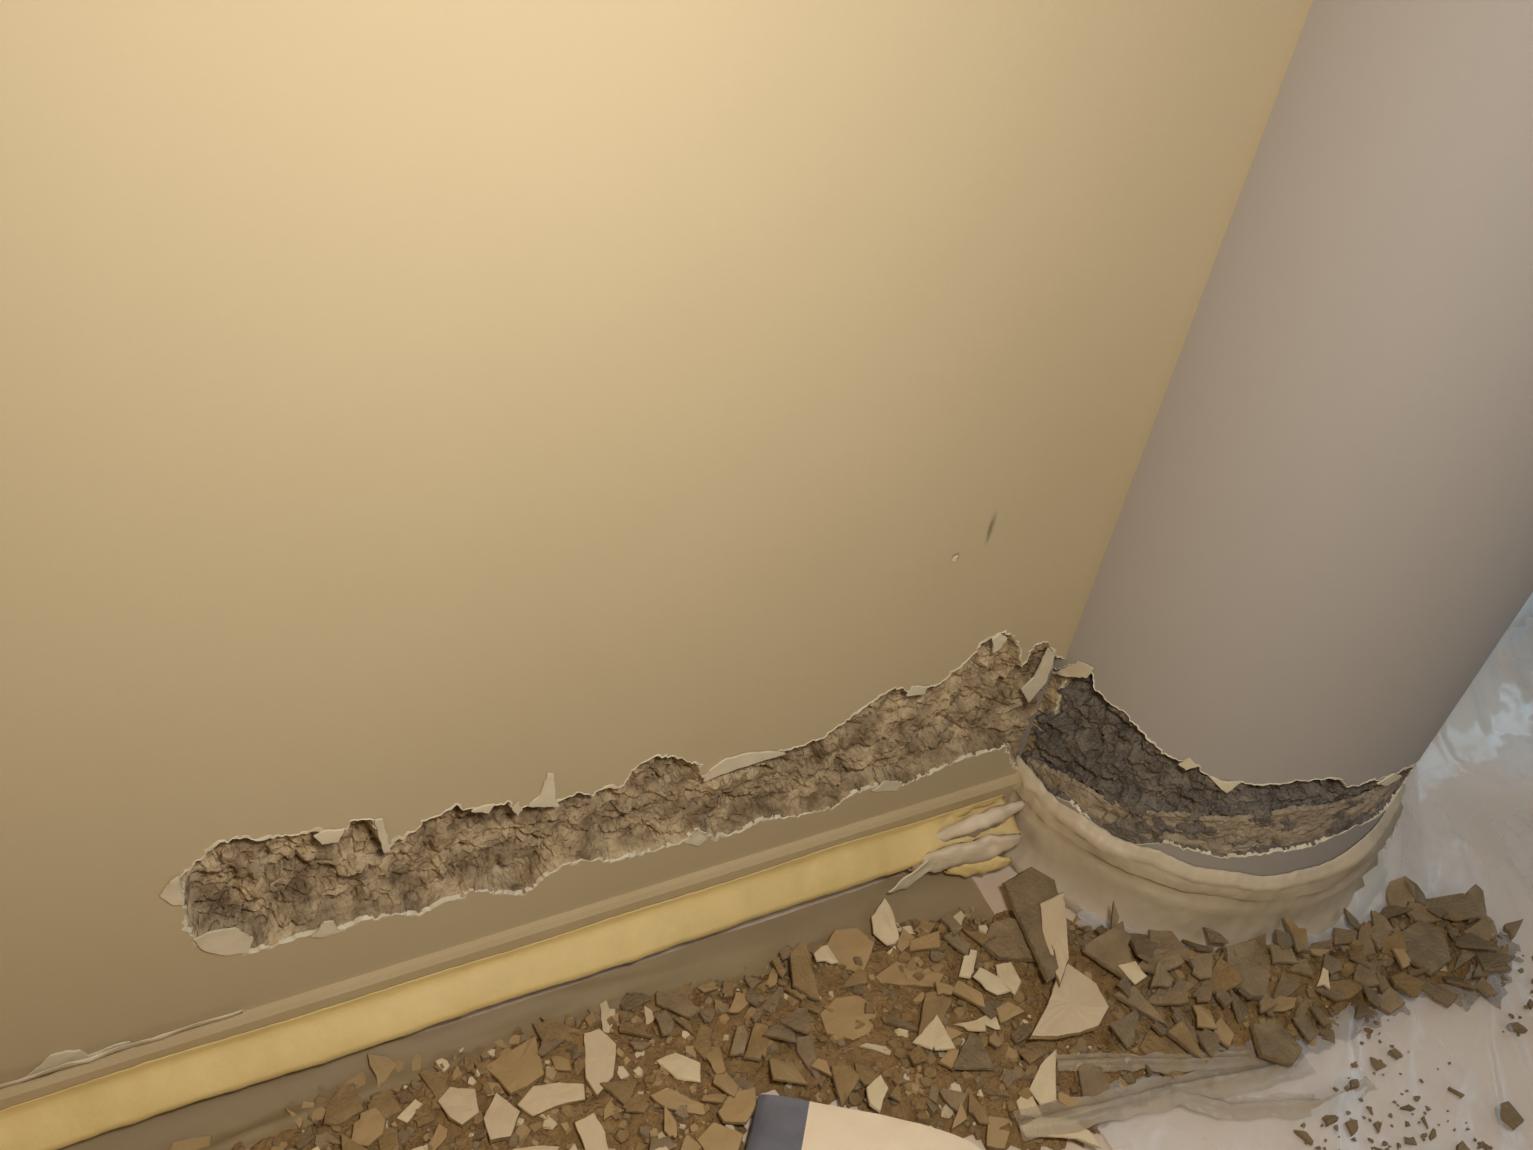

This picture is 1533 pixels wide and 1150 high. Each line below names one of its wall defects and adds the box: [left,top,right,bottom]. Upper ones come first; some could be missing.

spalling [160,630,1423,956]